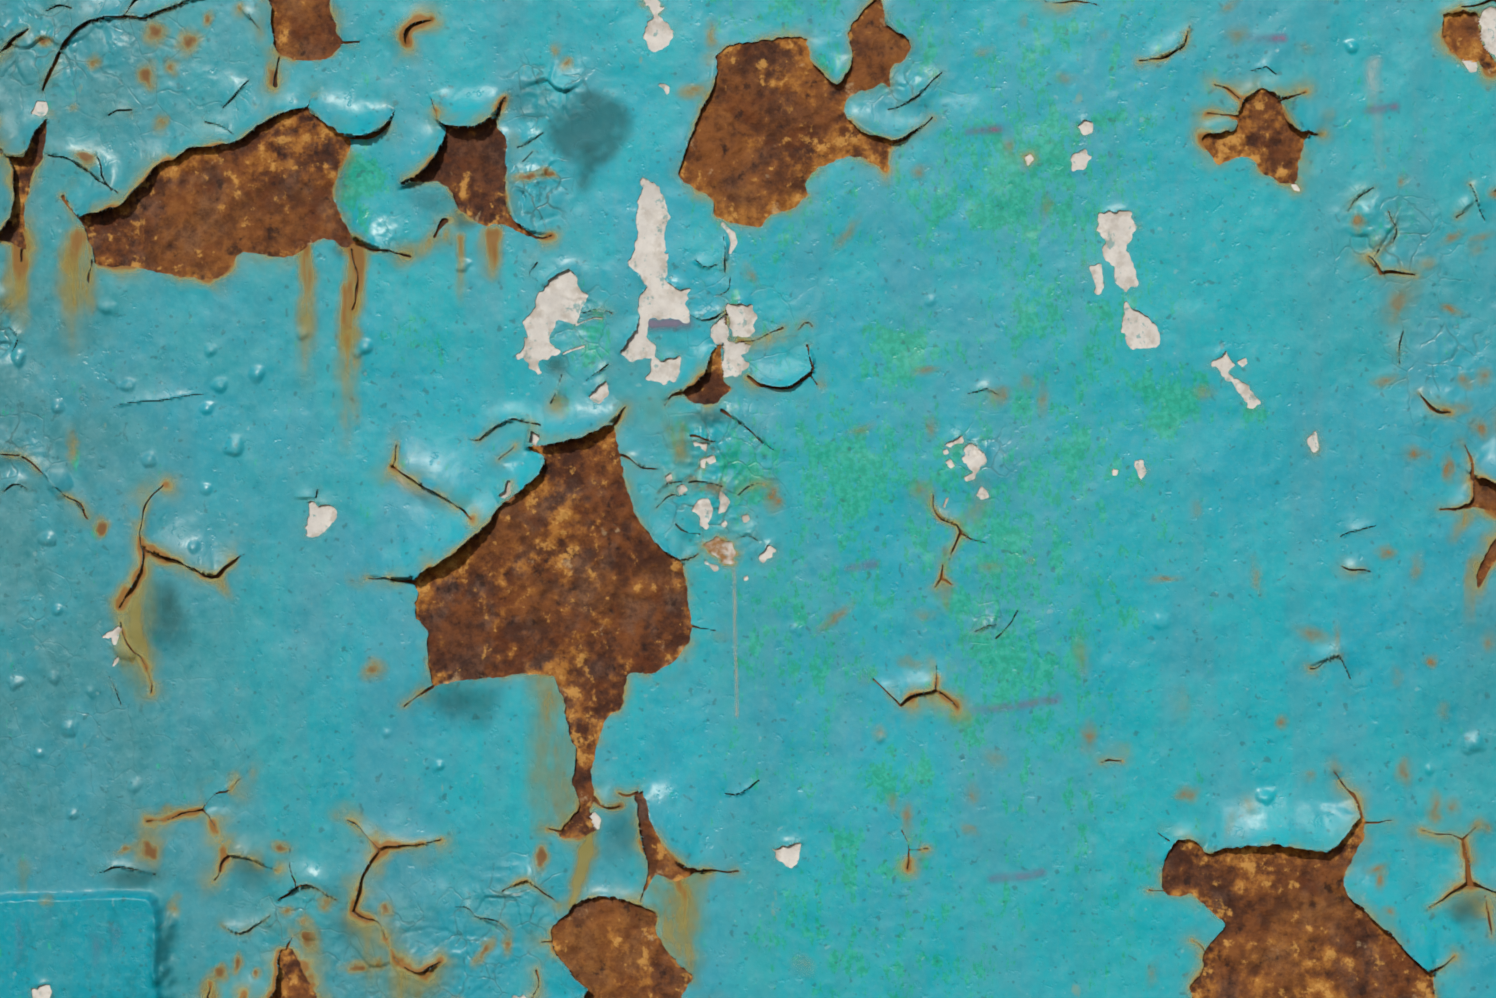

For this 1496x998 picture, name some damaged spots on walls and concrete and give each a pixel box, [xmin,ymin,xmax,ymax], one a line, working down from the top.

rust [60,0,557,375]
peeling [516,263,603,374]
peeling [615,177,691,385]
peeling [710,299,757,377]
rust [678,0,933,227]
peeling [1089,209,1160,350]
crack [109,479,245,705]
rust [366,396,739,998]
crack [873,665,962,716]
crack [142,771,447,994]
rust [1147,771,1458,998]
crack [1419,827,1496,935]